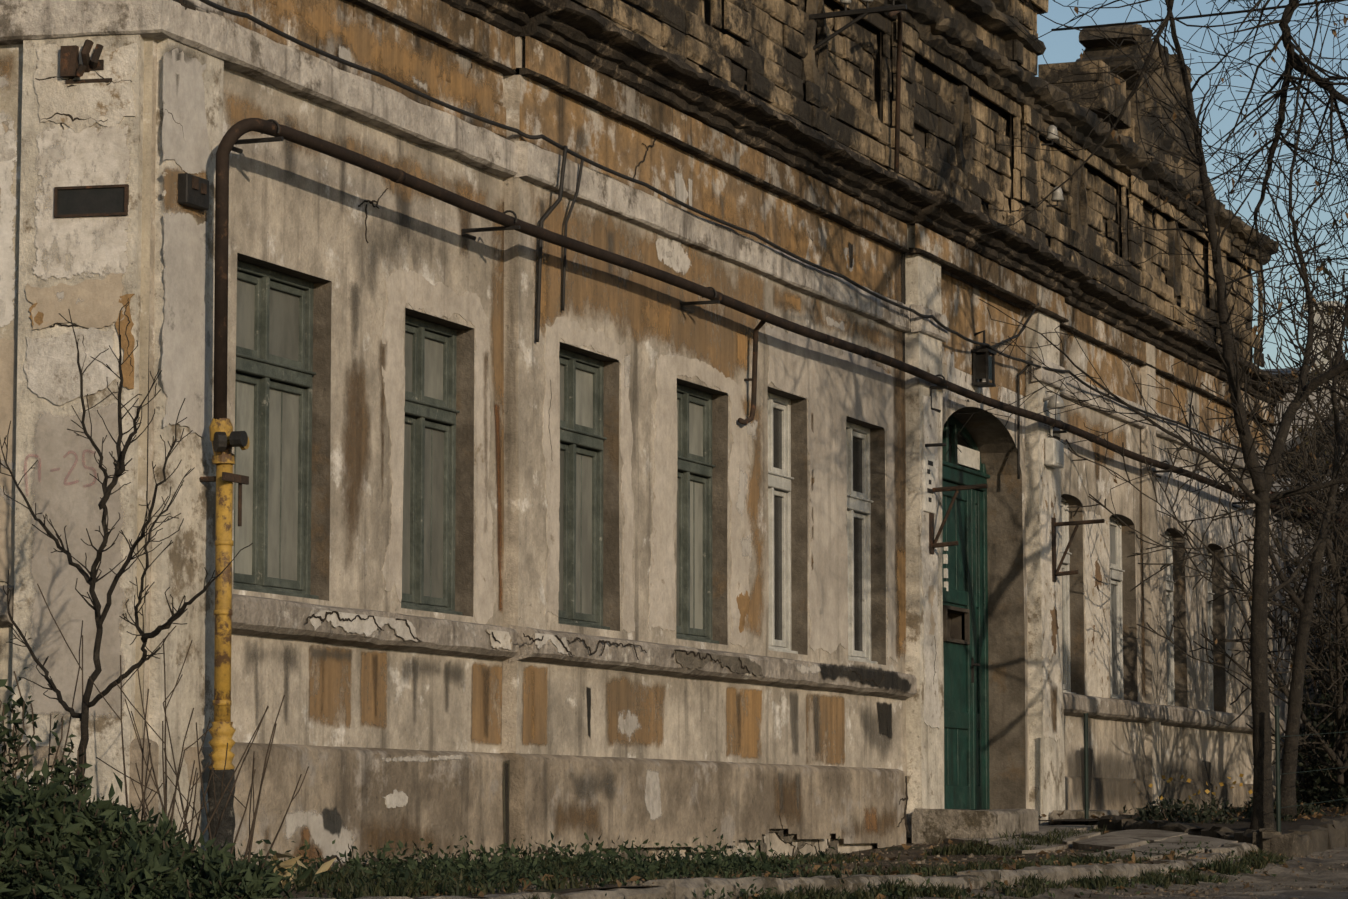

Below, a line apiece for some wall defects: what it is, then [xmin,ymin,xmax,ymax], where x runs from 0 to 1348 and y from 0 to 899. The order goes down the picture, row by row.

damp [575,131,586,161]
damp [675,171,692,206]
peeling [535,195,895,378]
damp [895,251,906,304]
flaking render [0,43,138,717]
damp [227,96,504,610]
damp [874,329,906,654]
peeling [607,677,665,746]
flaking render [382,789,408,808]
damp [556,777,613,835]
damp [645,770,662,820]
damp [775,774,801,821]